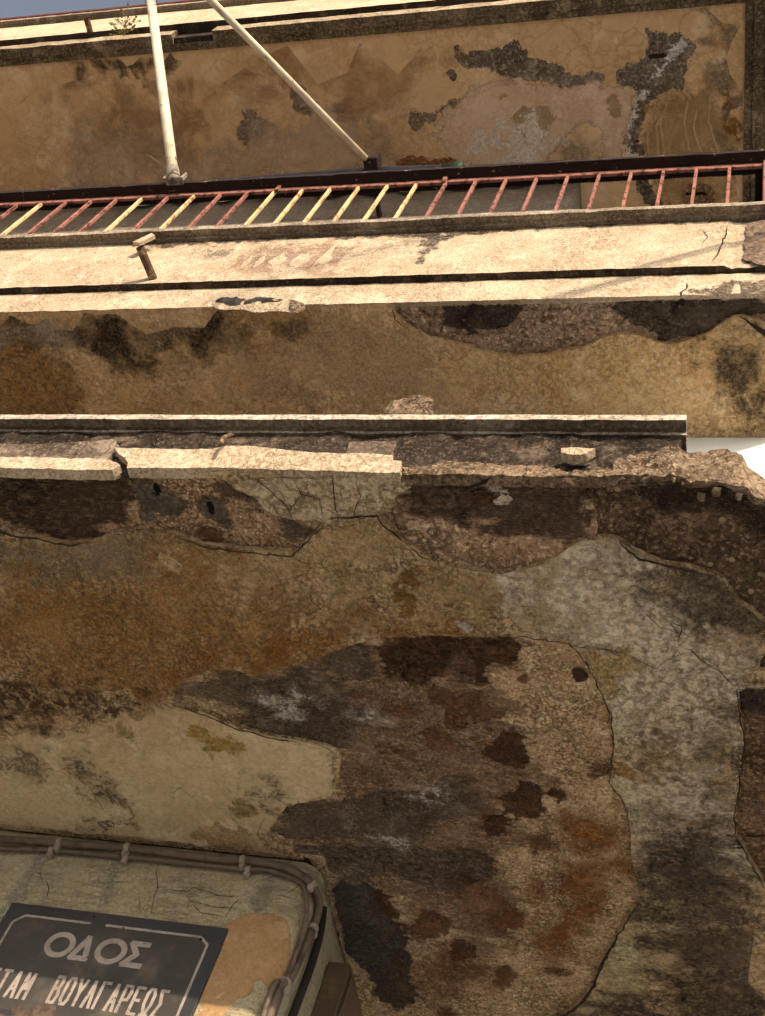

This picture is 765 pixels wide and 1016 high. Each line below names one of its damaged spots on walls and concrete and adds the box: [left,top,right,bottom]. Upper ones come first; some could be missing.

peeling [65,28,697,187]
water stain [0,310,429,415]
flaking render [395,298,765,355]
crack [740,316,765,337]
flaking render [0,473,323,548]
flaking render [383,446,765,617]
water stain [0,529,330,739]
water stain [62,757,127,808]
water stain [186,725,246,757]
flaking render [0,634,637,1016]
water stain [330,539,765,1016]
crack [97,863,242,918]